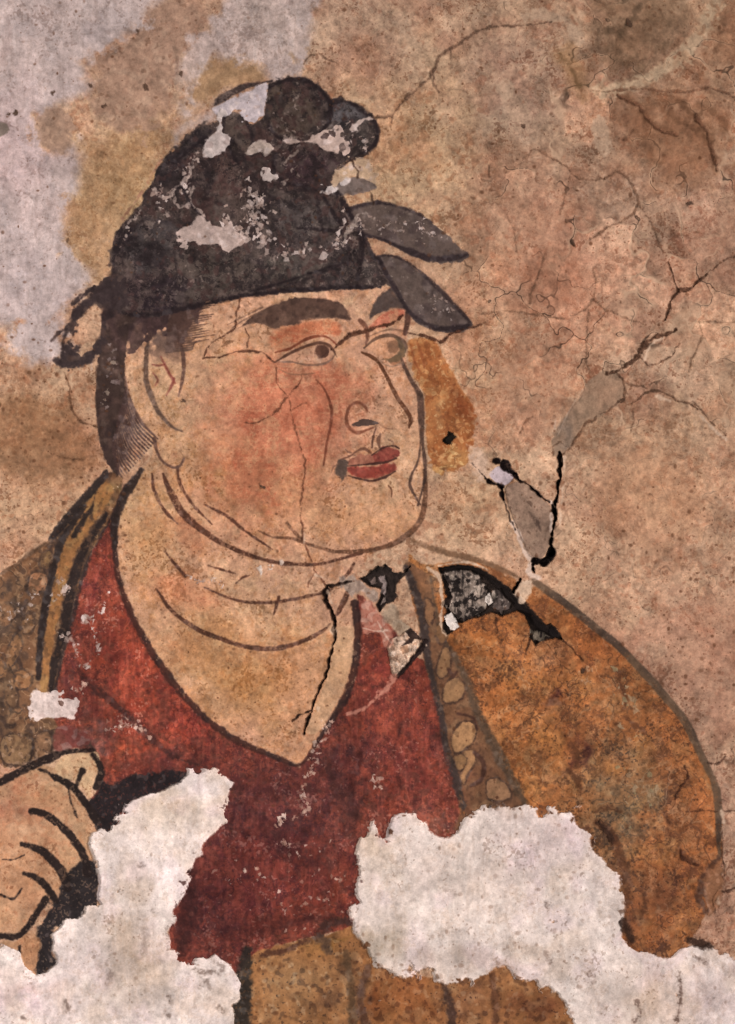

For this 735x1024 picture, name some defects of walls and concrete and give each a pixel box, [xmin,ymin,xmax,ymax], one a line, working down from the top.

peeling [108,0,444,263]
crack [371,20,553,124]
crack [329,85,735,637]
crack [201,296,353,736]
spalling [465,441,514,486]
spalling [425,519,563,647]
crack [524,637,532,655]
crack [560,638,585,661]
peeling [0,563,735,1024]